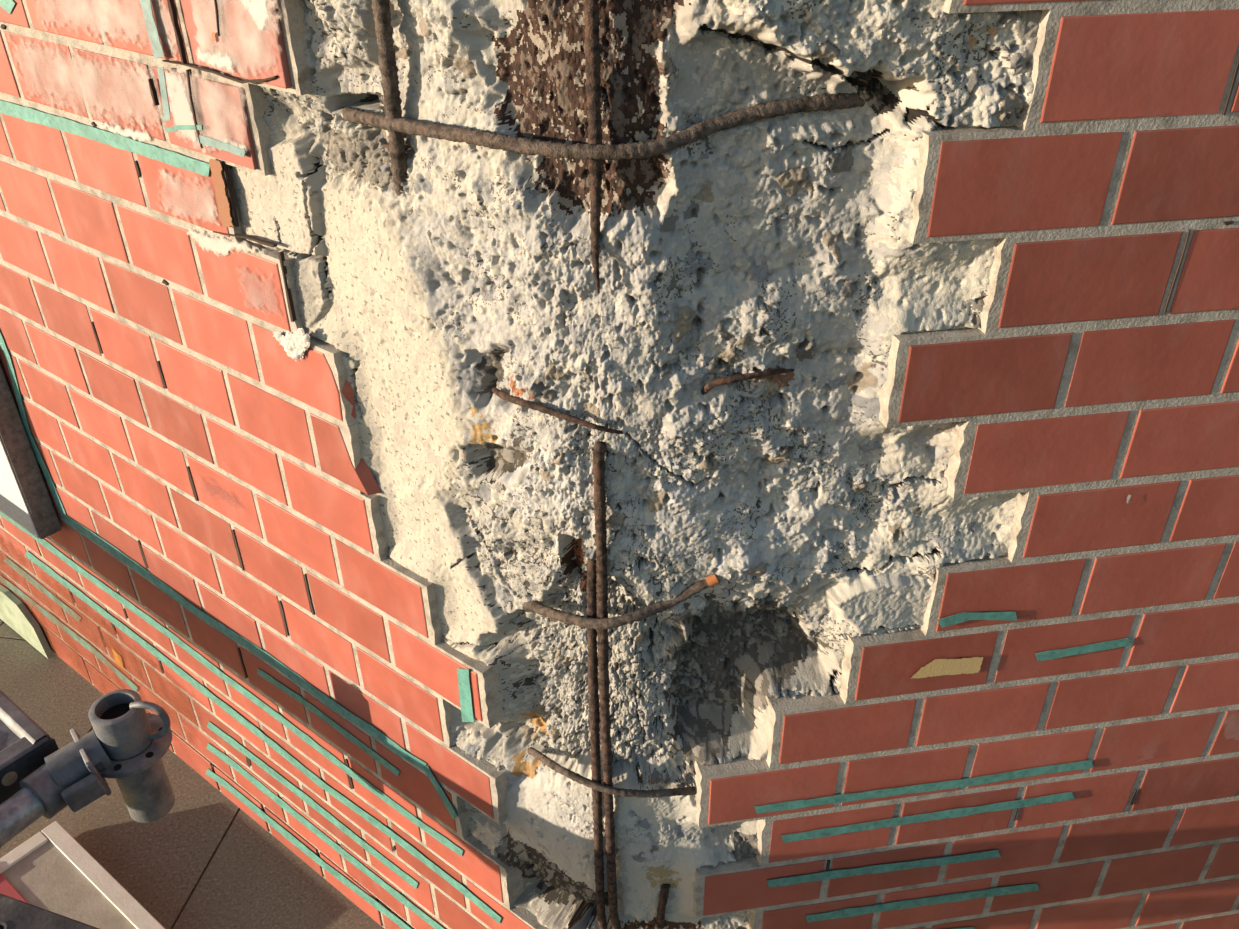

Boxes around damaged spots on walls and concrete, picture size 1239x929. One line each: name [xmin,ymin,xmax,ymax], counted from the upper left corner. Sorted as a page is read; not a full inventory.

efflorescence [21,0,280,153]
corrosion [492,0,691,218]
crack [699,24,954,151]
crack [148,0,332,322]
efflorescence [165,195,263,257]
corrosion [509,375,533,400]
corrosion [747,366,795,387]
peeling [229,0,1042,929]
corrosion [559,533,587,592]
corrosion [706,574,720,587]
corrosion [644,861,682,889]
corrosion [563,900,702,929]